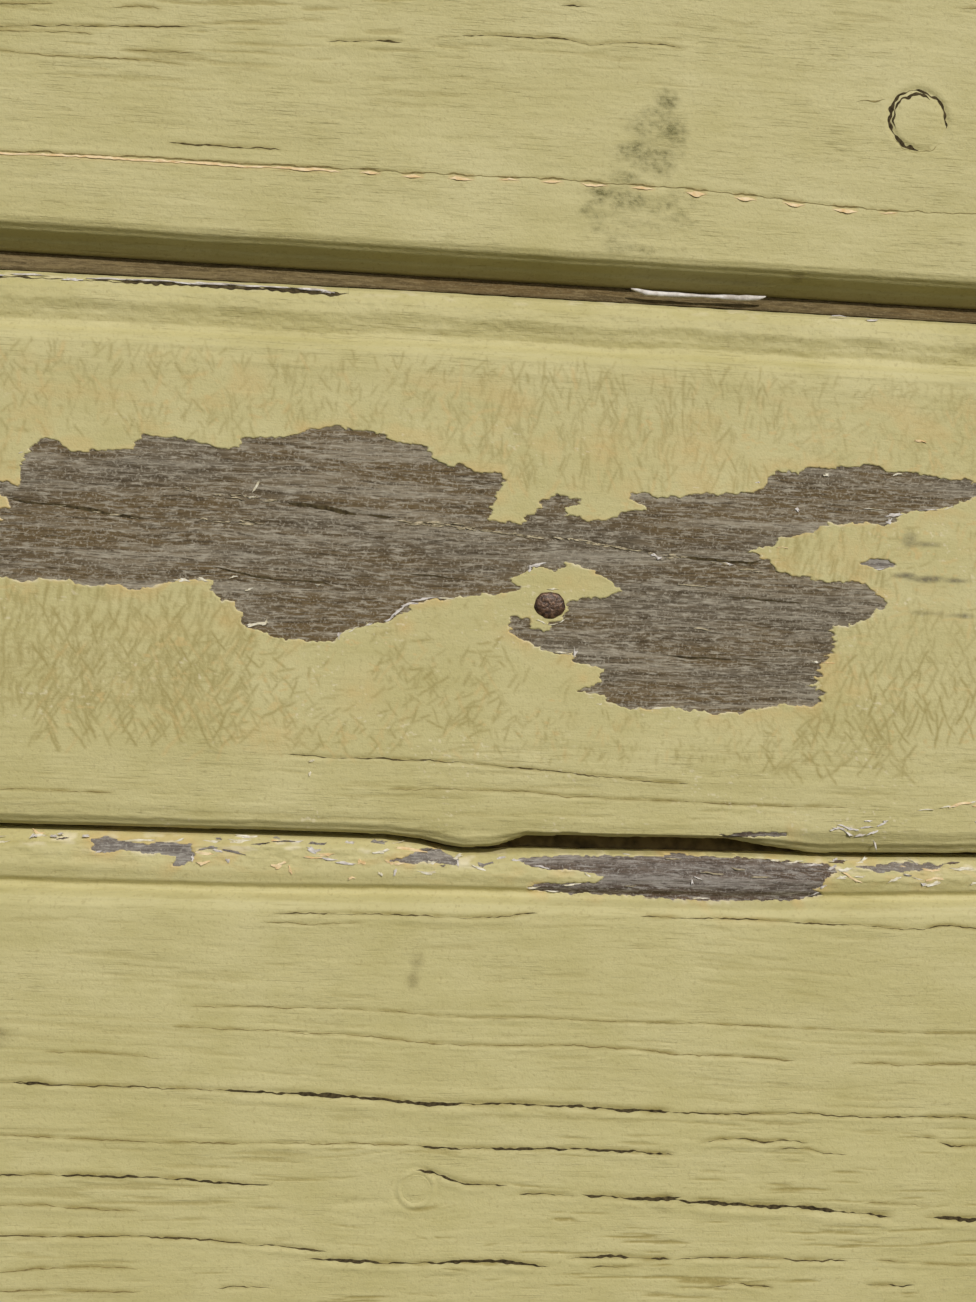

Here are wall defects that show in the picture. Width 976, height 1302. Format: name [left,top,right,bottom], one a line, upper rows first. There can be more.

crack [860,89,948,152]
crack [0,142,976,214]
peeling [0,425,976,715]
peeling [30,820,976,901]
crack [13,1051,972,1155]
crack [13,1135,976,1223]
crack [0,1174,845,1293]